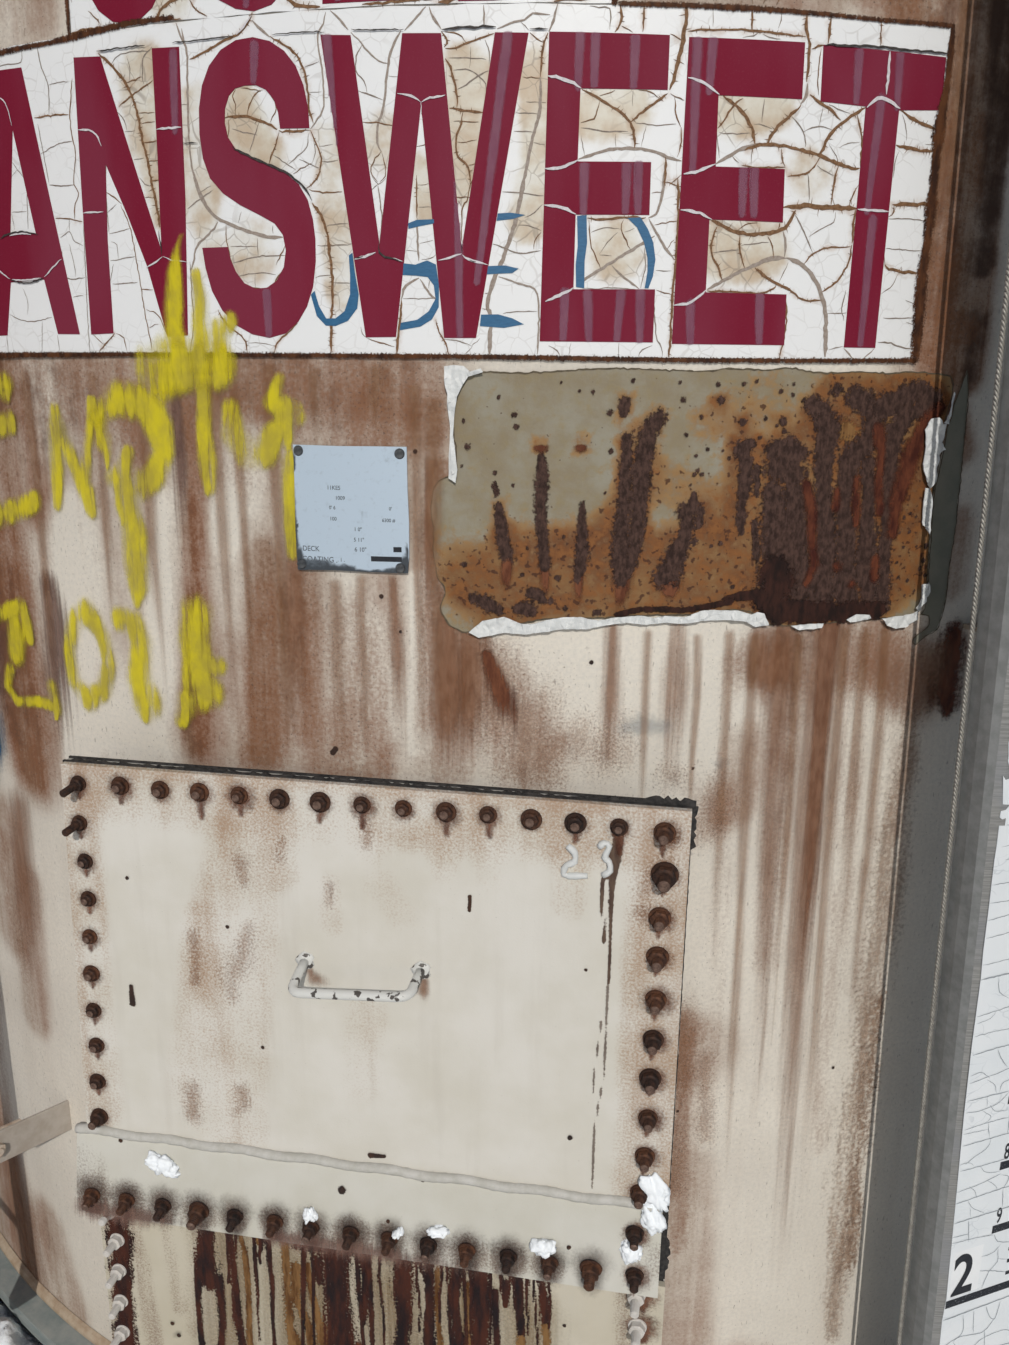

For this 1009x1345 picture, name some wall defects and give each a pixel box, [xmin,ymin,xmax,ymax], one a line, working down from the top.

crack [0,0,948,358]
peeling [430,365,969,645]
rust [195,796,211,820]
rust [351,794,374,829]
rust [752,626,793,943]
rust [790,623,839,1068]
rust [904,621,968,719]
rust [7,1156,32,1262]
rust [78,1183,171,1345]
rust [191,1199,560,1345]
rust [591,826,630,1187]
crack [945,845,1009,1345]